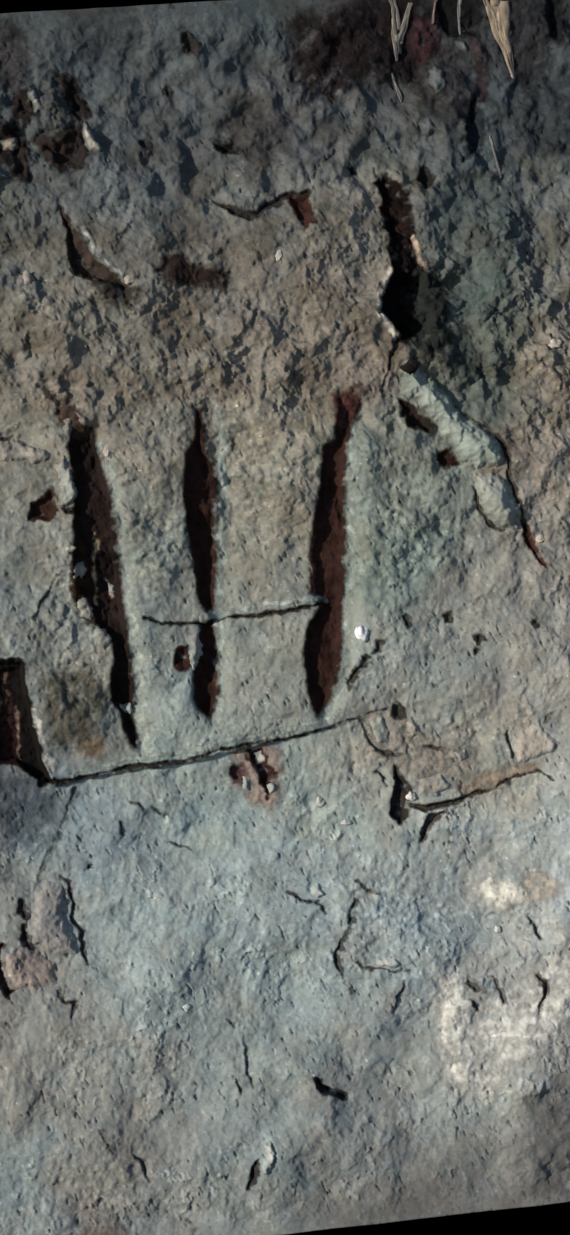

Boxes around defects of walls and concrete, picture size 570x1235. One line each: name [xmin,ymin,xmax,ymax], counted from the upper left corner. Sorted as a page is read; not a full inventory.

spalling [416,166,435,188]
spalling [373,172,529,531]
crack [389,763,554,876]